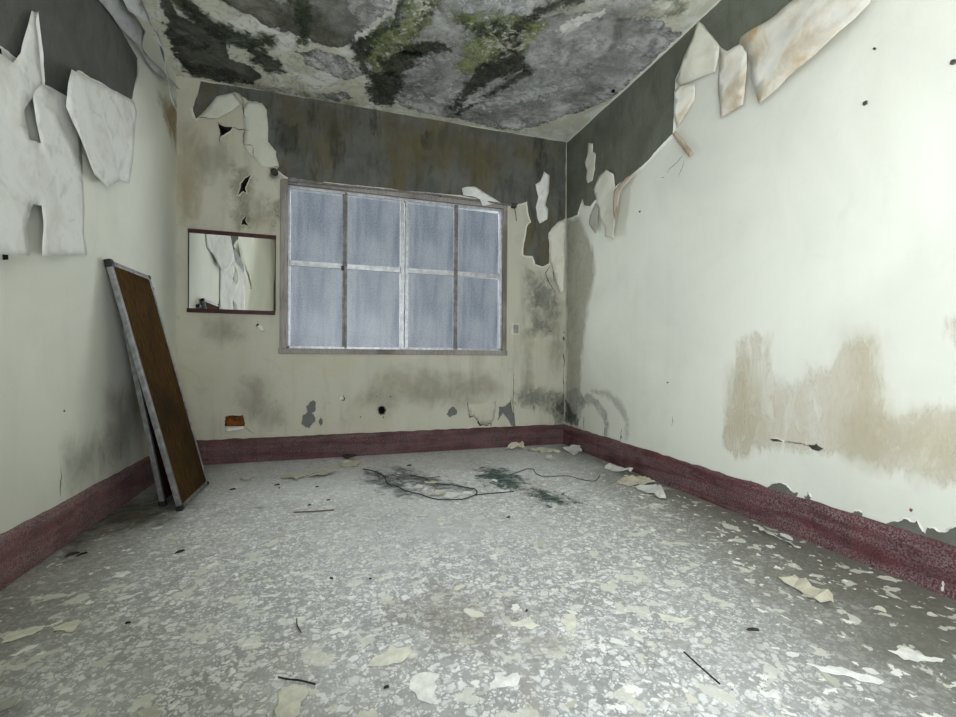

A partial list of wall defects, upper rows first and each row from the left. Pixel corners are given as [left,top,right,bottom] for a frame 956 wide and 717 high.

peeling [99,0,284,114]
water stain [167,0,288,80]
water stain [281,0,312,46]
peeling [222,0,682,130]
water stain [343,0,640,126]
water stain [164,104,177,139]
water stain [519,221,593,425]
flaking render [301,400,323,429]
flaking render [497,375,515,426]
flaking render [767,482,812,500]
flaking render [886,508,956,546]